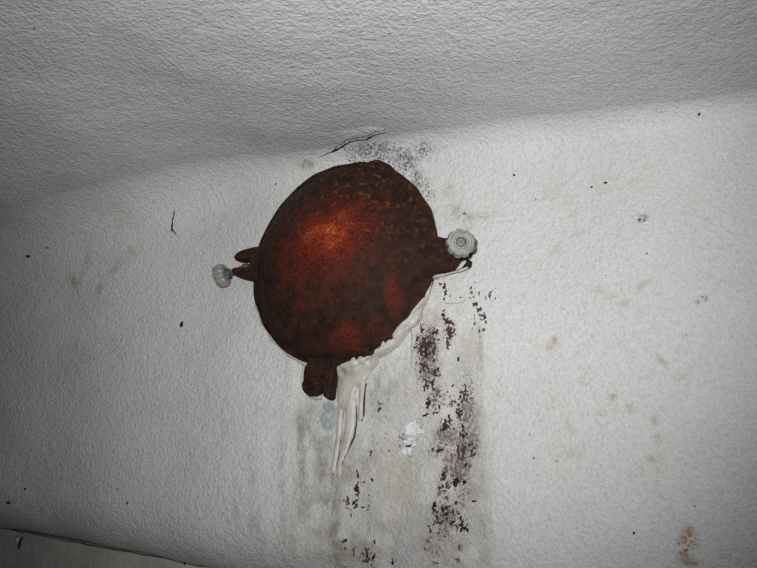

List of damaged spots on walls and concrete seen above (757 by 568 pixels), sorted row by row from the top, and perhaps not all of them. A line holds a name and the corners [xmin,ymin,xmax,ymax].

crack [319,126,386,157]
damp [345,141,435,201]